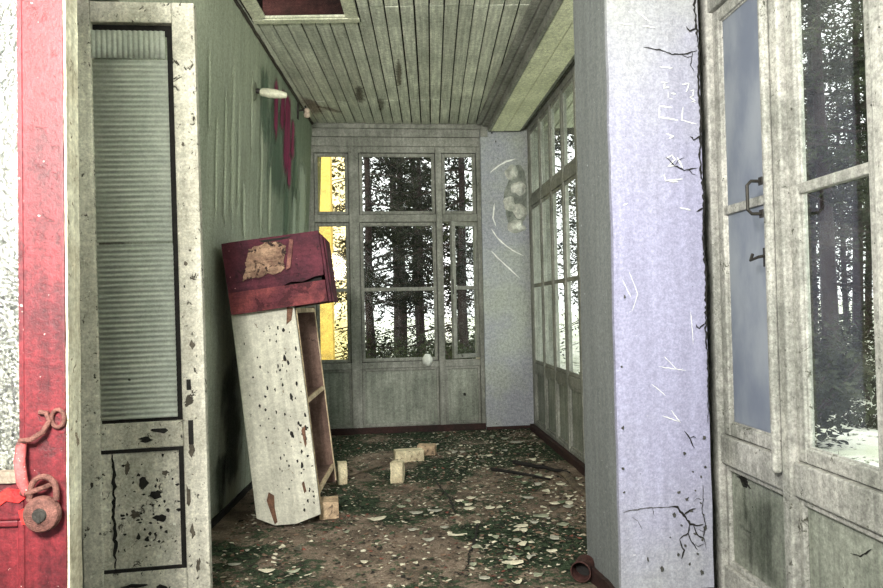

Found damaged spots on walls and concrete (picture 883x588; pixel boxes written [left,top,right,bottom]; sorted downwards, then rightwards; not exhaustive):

crack [644,0,709,447]
crack [626,489,706,559]